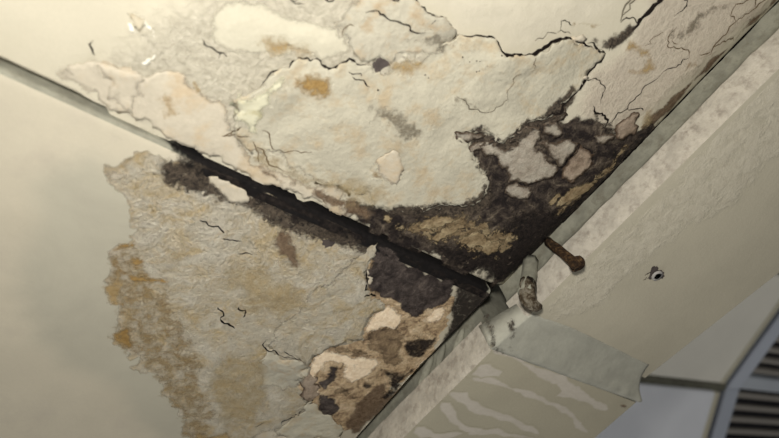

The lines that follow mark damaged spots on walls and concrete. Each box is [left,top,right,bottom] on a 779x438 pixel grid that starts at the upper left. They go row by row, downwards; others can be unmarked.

leakage [297,76,329,98]
peeling [48,0,605,255]
crack [342,0,765,129]
peeling [594,112,640,145]
leakage [0,87,695,438]
flaking render [253,245,455,438]